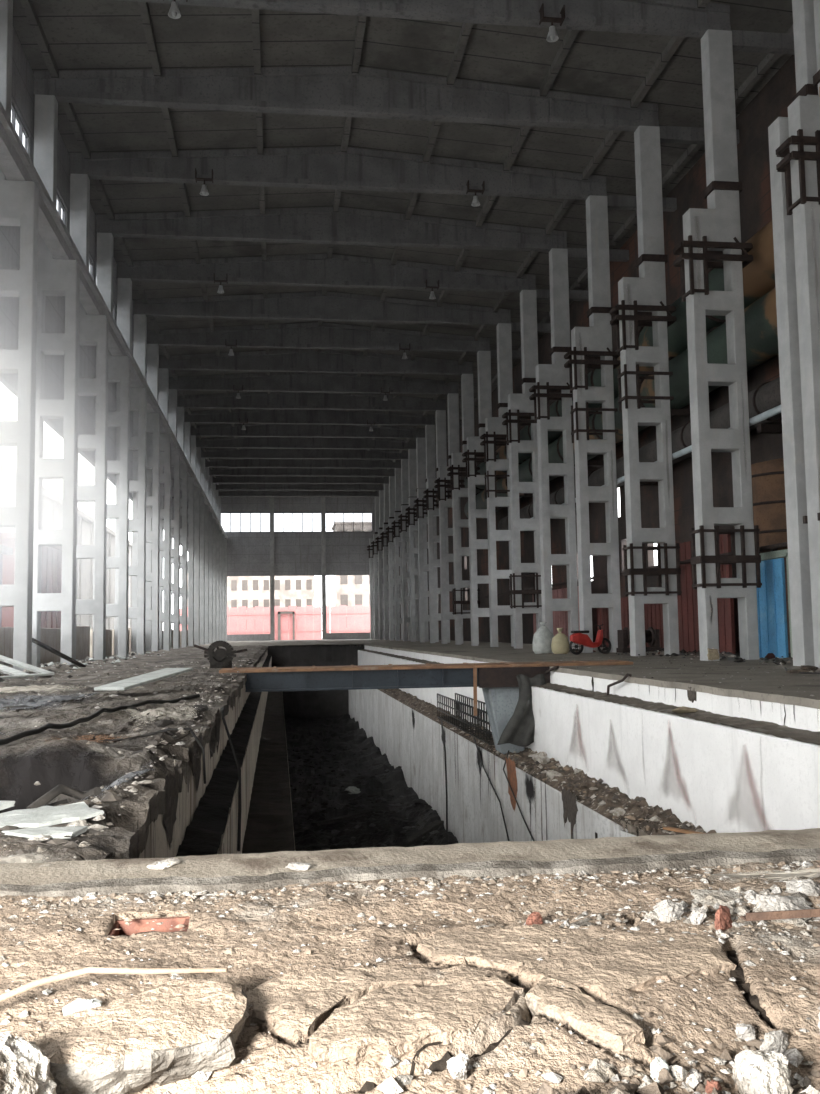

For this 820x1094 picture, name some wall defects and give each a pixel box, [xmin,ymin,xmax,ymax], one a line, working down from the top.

spalling [400,687,492,732]
spalling [138,685,268,858]
spalling [526,666,820,833]
peeling [615,817,649,836]
crack [510,975,519,986]
crack [719,950,774,1029]
crack [410,1019,530,1075]
crack [359,1081,377,1093]